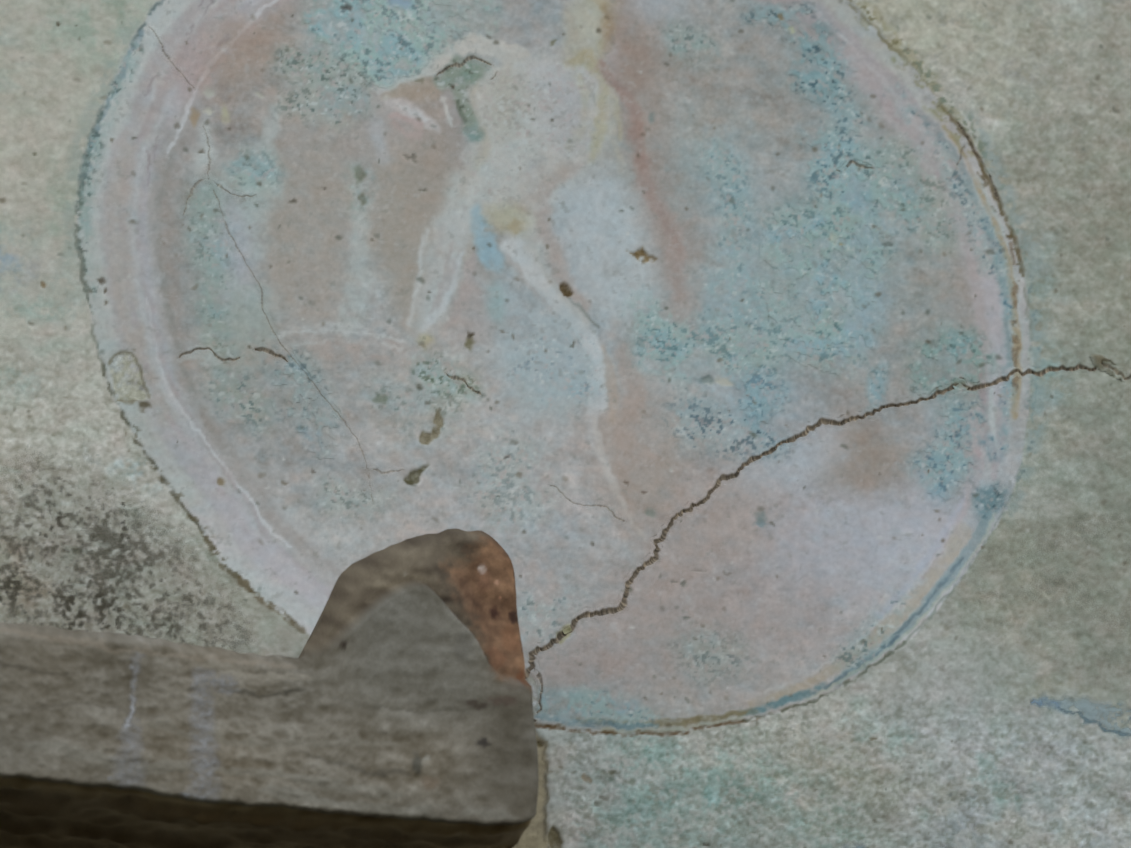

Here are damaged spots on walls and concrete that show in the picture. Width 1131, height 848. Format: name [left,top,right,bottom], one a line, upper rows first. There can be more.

crack [144,22,198,93]
crack [175,123,405,505]
water stain [0,513,191,637]
crack [525,359,1131,727]